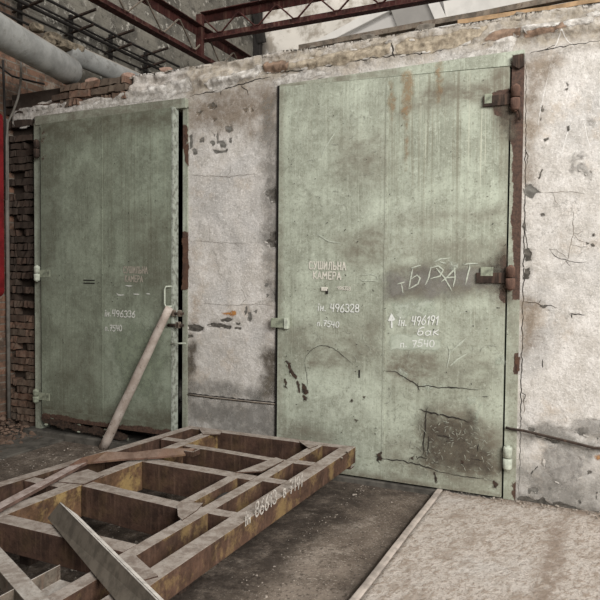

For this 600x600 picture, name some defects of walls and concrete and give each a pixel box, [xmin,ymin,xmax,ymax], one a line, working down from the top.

crack [350,43,443,62]
crack [194,65,333,95]
flaking render [12,77,192,128]
flaking render [190,126,233,155]
corrosion [181,236,189,290]
crack [518,40,600,490]
flaking render [188,317,241,338]
crack [391,371,488,397]
crack [376,408,484,483]